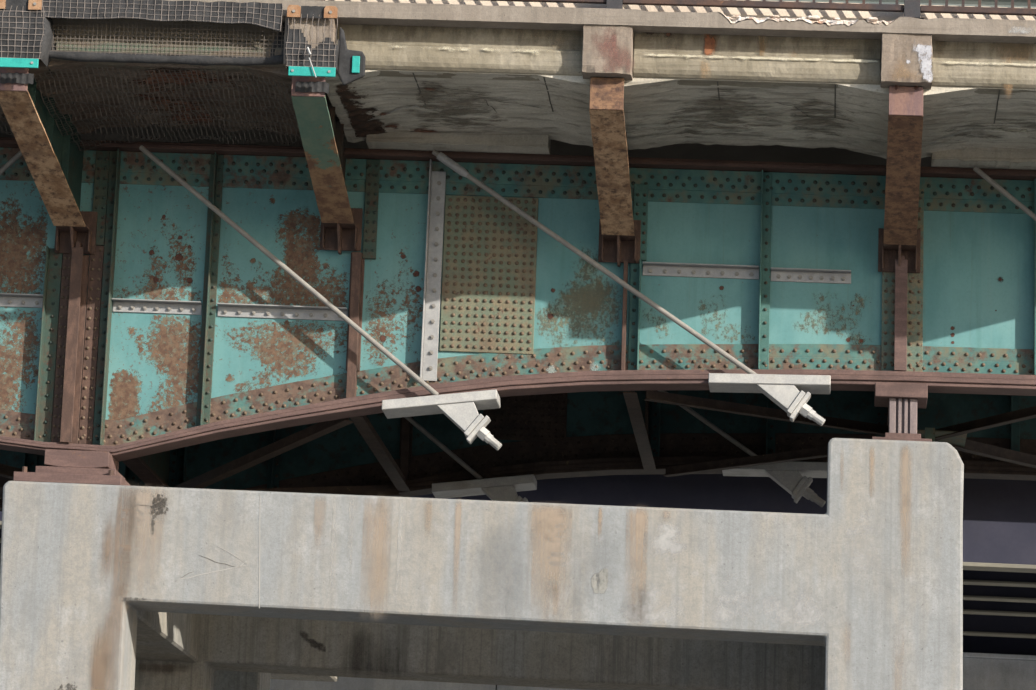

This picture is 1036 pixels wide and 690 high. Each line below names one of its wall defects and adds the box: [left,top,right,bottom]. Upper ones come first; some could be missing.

spalling [721,13,899,26]
corrosion [0,198,48,294]
corrosion [113,215,201,301]
corrosion [218,198,348,307]
corrosion [0,311,40,412]
corrosion [108,315,201,420]
corrosion [224,320,348,393]
spalling [150,494,168,535]